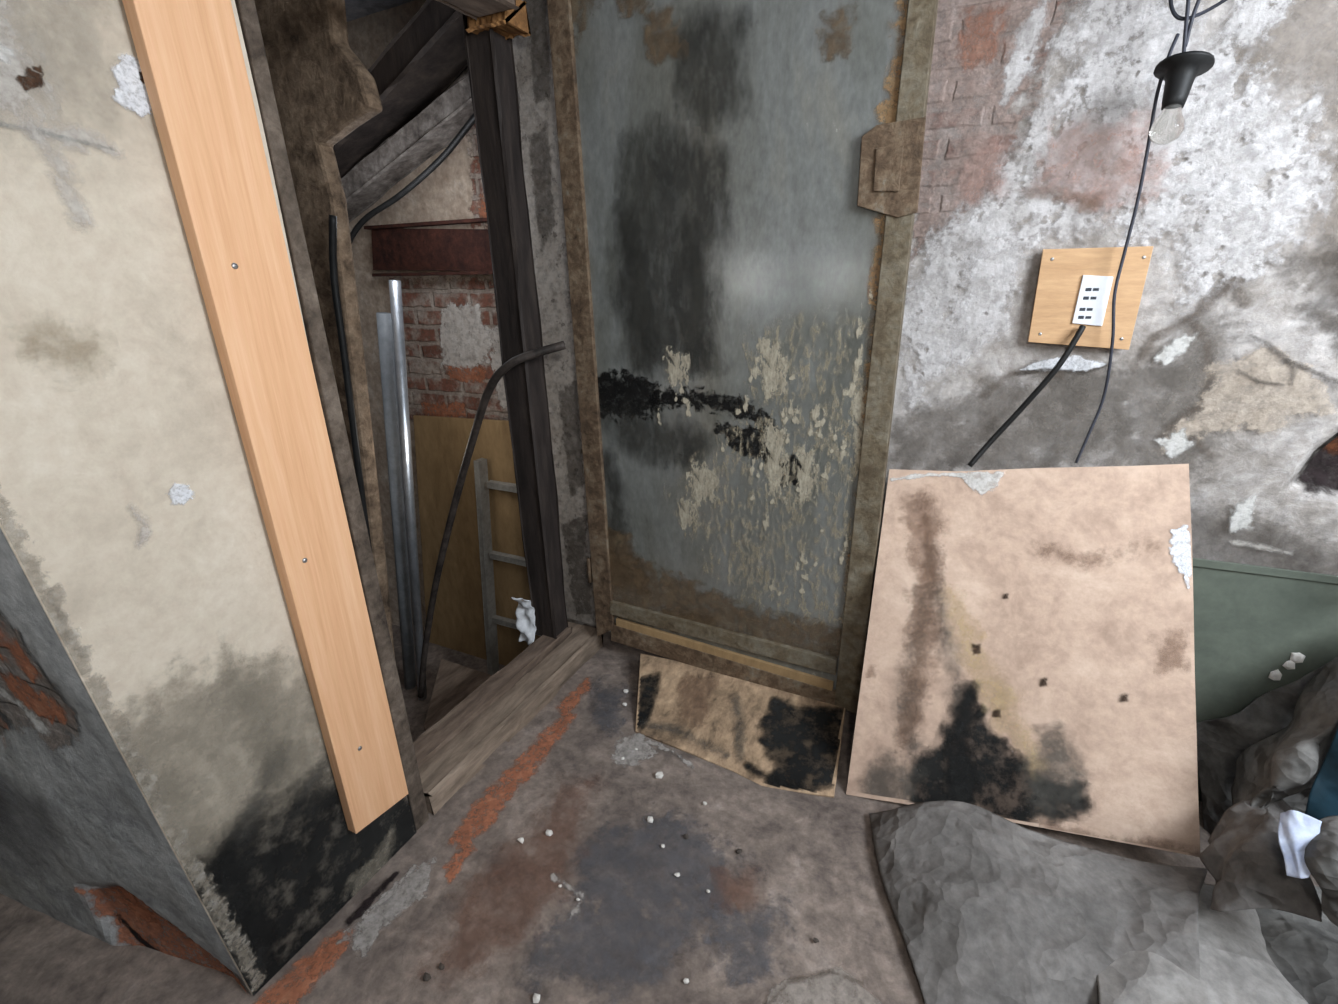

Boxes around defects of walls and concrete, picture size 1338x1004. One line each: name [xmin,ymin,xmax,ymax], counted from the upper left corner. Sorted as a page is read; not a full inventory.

peeling [663,346,691,417]
peeling [1154,335,1195,365]
peeling [1156,347,1336,457]
peeling [678,314,874,626]
spalling [1296,436,1338,494]
spalling [0,497,266,996]
leakage [611,673,694,768]
leakage [724,697,844,793]
leakage [865,680,1092,823]
leakage [120,657,436,996]
leakage [551,873,584,916]